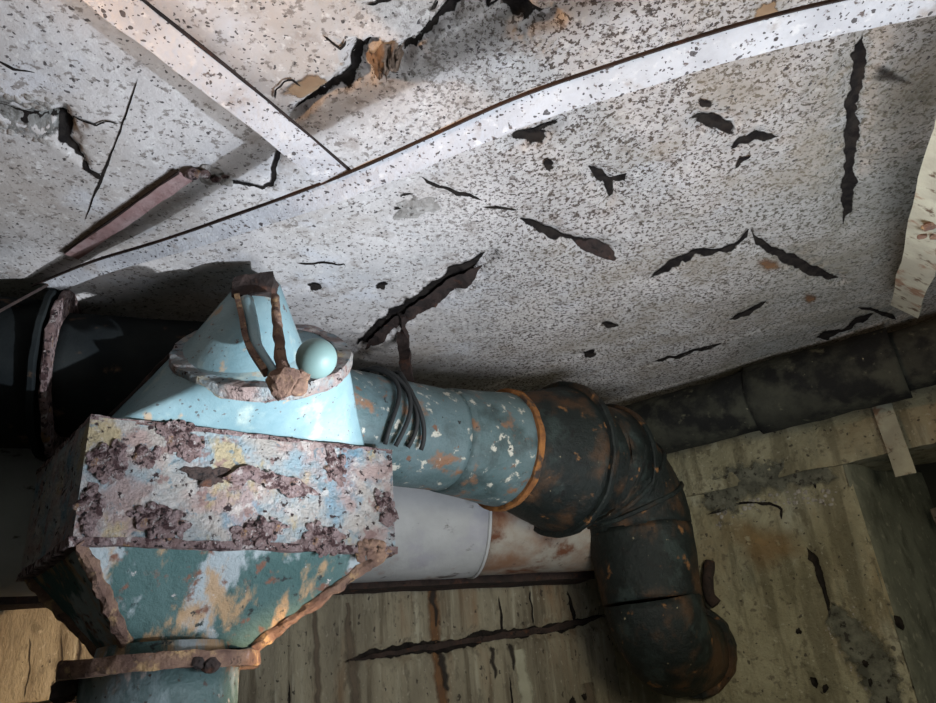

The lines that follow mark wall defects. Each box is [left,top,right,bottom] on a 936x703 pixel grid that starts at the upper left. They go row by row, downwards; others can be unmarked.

spalling [484,0,558,53]
spalling [274,0,461,108]
crack [0,61,138,219]
spalling [512,118,559,145]
spalling [588,166,626,197]
crack [496,598,504,629]
crack [527,592,535,624]
crack [567,592,576,620]
crack [807,548,831,614]
rust [428,591,447,703]